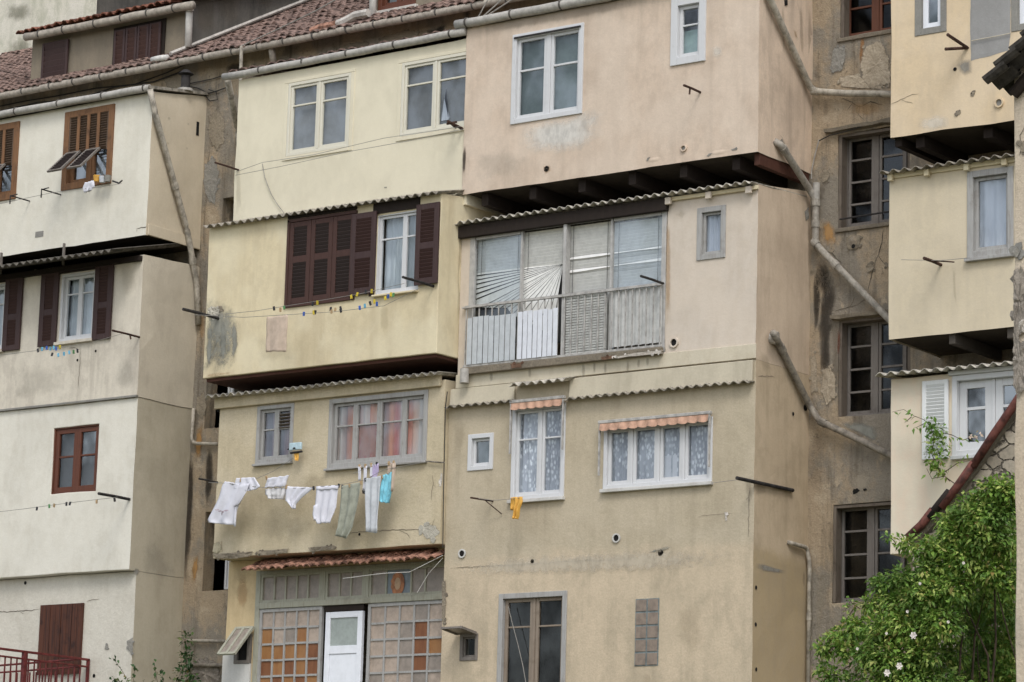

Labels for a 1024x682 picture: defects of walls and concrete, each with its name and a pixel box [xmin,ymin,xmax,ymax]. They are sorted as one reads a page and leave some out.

spalling [830,41,891,91]
leakage [207,311,237,363]
leakage [814,269,834,369]